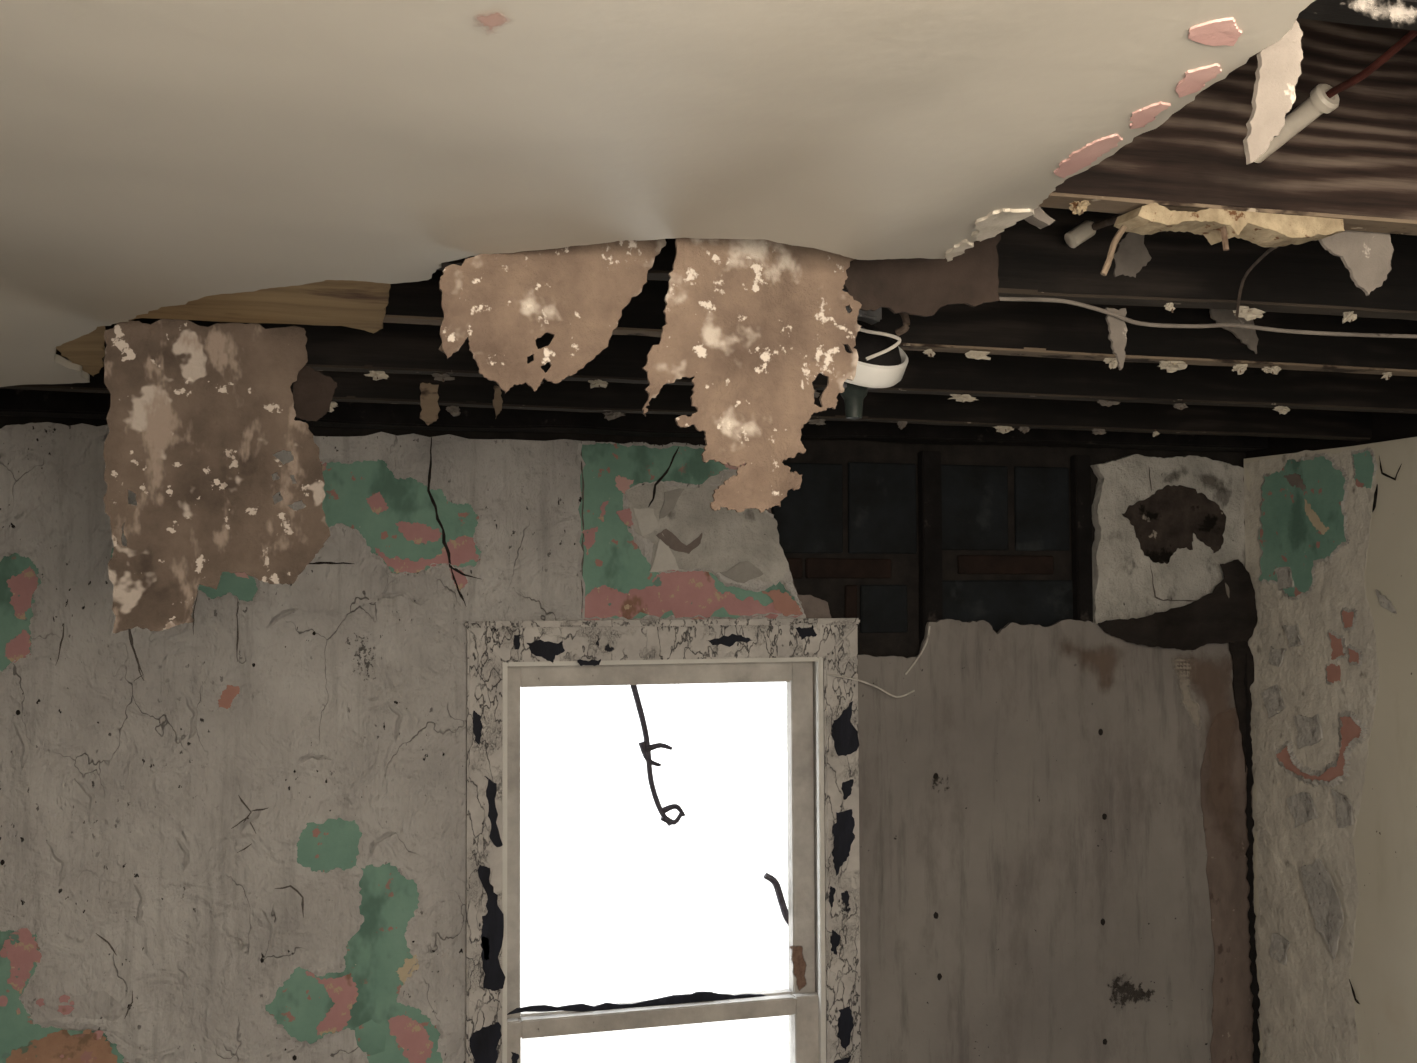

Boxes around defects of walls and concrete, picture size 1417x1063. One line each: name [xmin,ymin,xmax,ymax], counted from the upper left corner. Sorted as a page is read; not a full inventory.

spalling [945,208,1034,262]
peeling [321,458,485,590]
crack [427,437,480,606]
peeling [576,441,831,647]
peeling [513,635,601,666]
peeling [831,701,859,756]
water stain [1174,658,1236,835]
peeling [1244,447,1397,1063]
peeling [829,779,855,908]
peeling [261,814,444,1063]
peeling [478,865,505,991]
peeling [470,1022,519,1063]